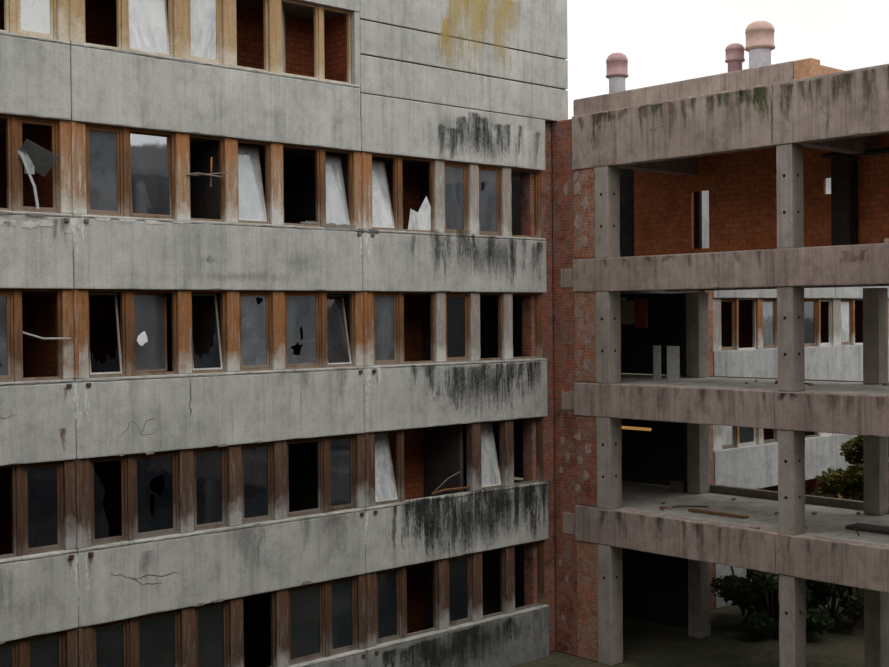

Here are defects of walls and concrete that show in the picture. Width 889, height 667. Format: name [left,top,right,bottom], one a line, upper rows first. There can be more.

damp [639,98,695,117]
damp [706,87,768,110]
damp [439,113,521,152]
damp [434,230,542,266]
damp [453,362,540,396]
damp [393,482,551,549]
crack [112,572,178,585]